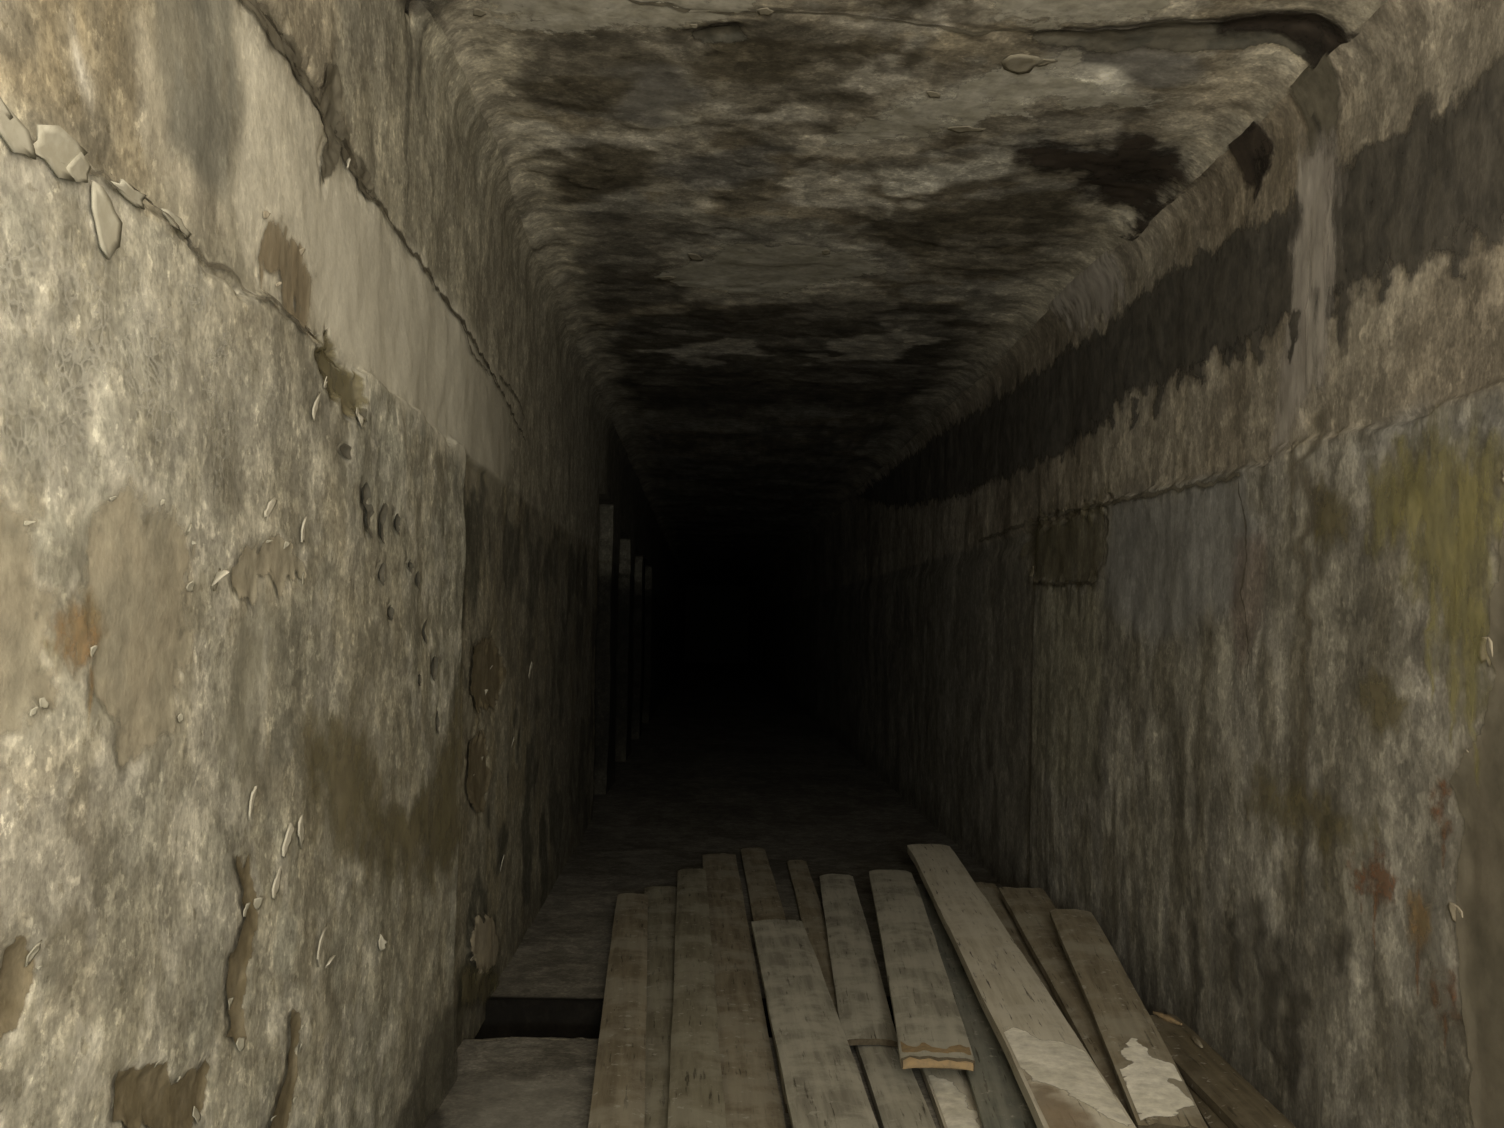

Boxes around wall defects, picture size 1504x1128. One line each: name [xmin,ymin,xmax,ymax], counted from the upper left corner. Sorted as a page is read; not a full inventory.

peeling [0,97,369,428]
crack [240,0,529,440]
flaking render [339,444,352,459]
flaking render [361,482,401,544]
leakage [857,52,1504,900]
peeling [78,476,229,766]
flaking render [418,618,438,686]
peeling [0,935,42,1039]
peeling [226,855,263,1051]
peeling [112,1058,210,1128]
peeling [270,1009,305,1128]